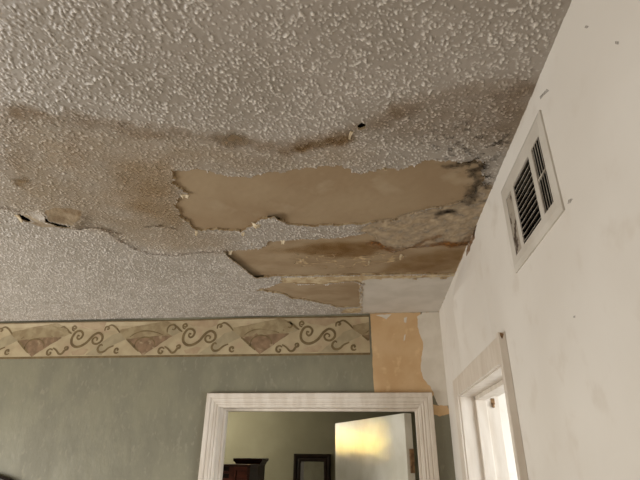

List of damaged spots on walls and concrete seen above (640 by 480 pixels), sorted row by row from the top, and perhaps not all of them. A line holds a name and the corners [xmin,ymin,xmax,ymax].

peeling [173,159,484,307]